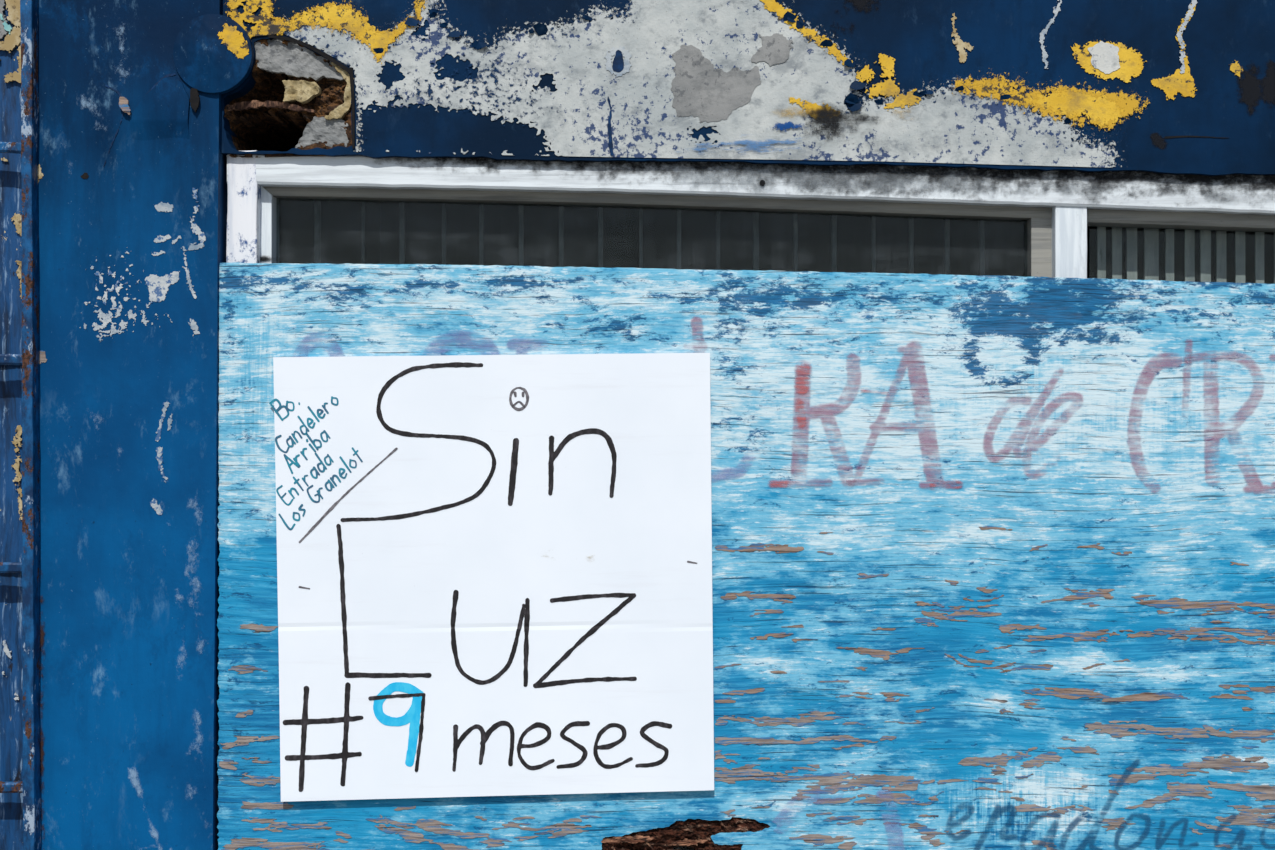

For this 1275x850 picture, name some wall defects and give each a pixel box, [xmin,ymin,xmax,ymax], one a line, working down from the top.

peeling [217,0,1150,168]
peeling [79,188,206,342]
peeling [11,425,22,520]
peeling [715,543,834,555]
peeling [240,624,278,633]
peeling [720,591,818,642]
peeling [915,587,1275,672]
peeling [817,647,924,702]
peeling [219,736,281,786]
peeling [715,684,1275,850]
peeling [221,801,352,850]
peeling [366,806,600,850]